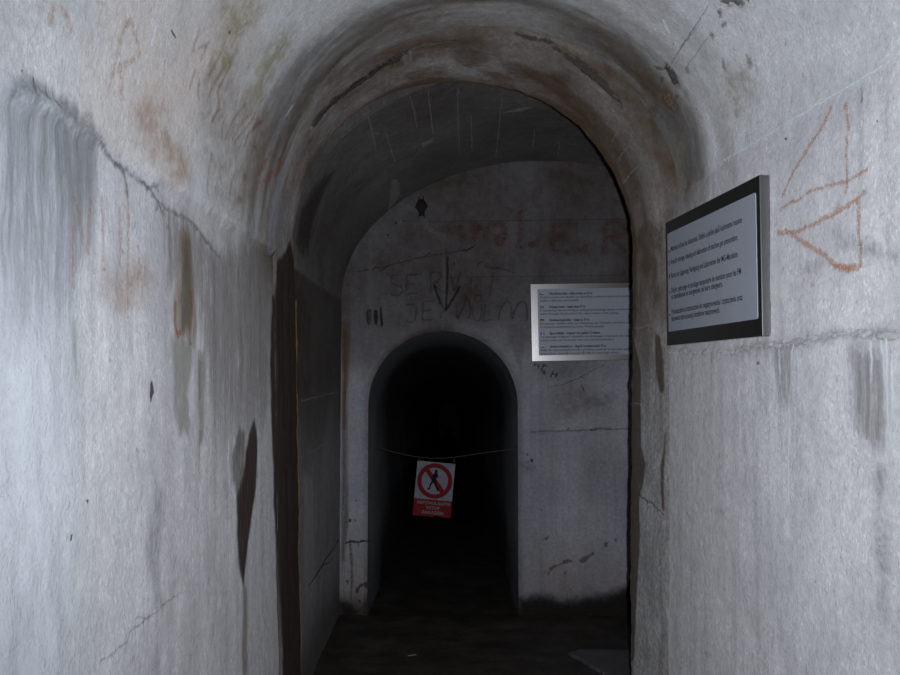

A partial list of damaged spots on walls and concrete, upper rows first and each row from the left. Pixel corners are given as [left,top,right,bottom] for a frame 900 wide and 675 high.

spalling [312,50,409,127]
water stain [858,339,893,414]